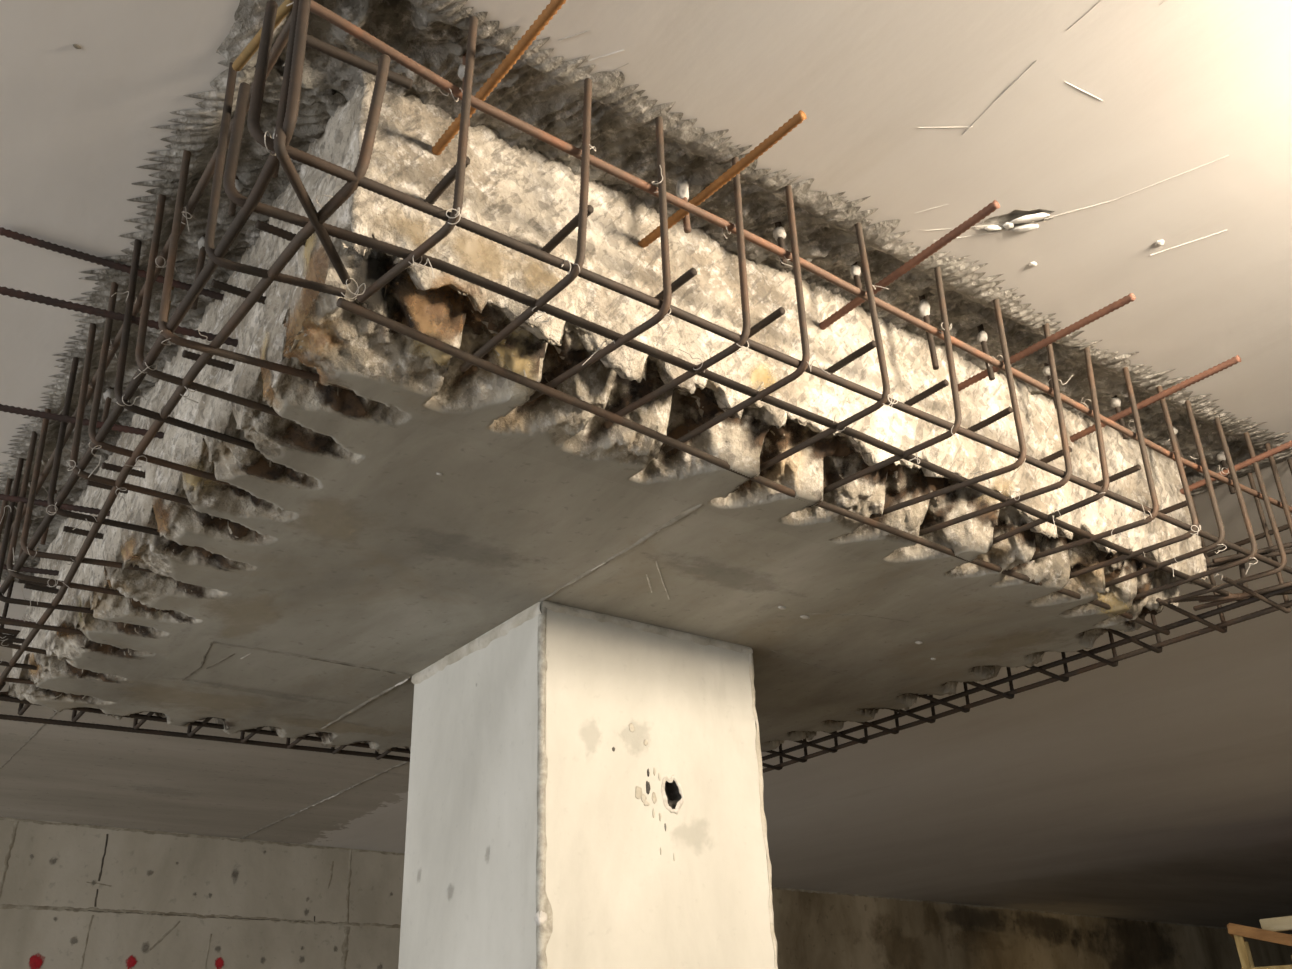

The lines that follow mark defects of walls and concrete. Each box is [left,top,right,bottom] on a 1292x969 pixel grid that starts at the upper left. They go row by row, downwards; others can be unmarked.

rust [432,0,566,156]
rust [283,236,376,418]
rust [386,268,601,413]
rust [638,110,807,248]
rust [819,200,1000,330]
spalling [974,208,1054,232]
rust [957,293,1136,391]
rust [1070,355,1242,442]
rust [186,456,311,510]
rust [585,366,1162,627]
rust [56,598,191,659]
spalling [8,224,1207,969]